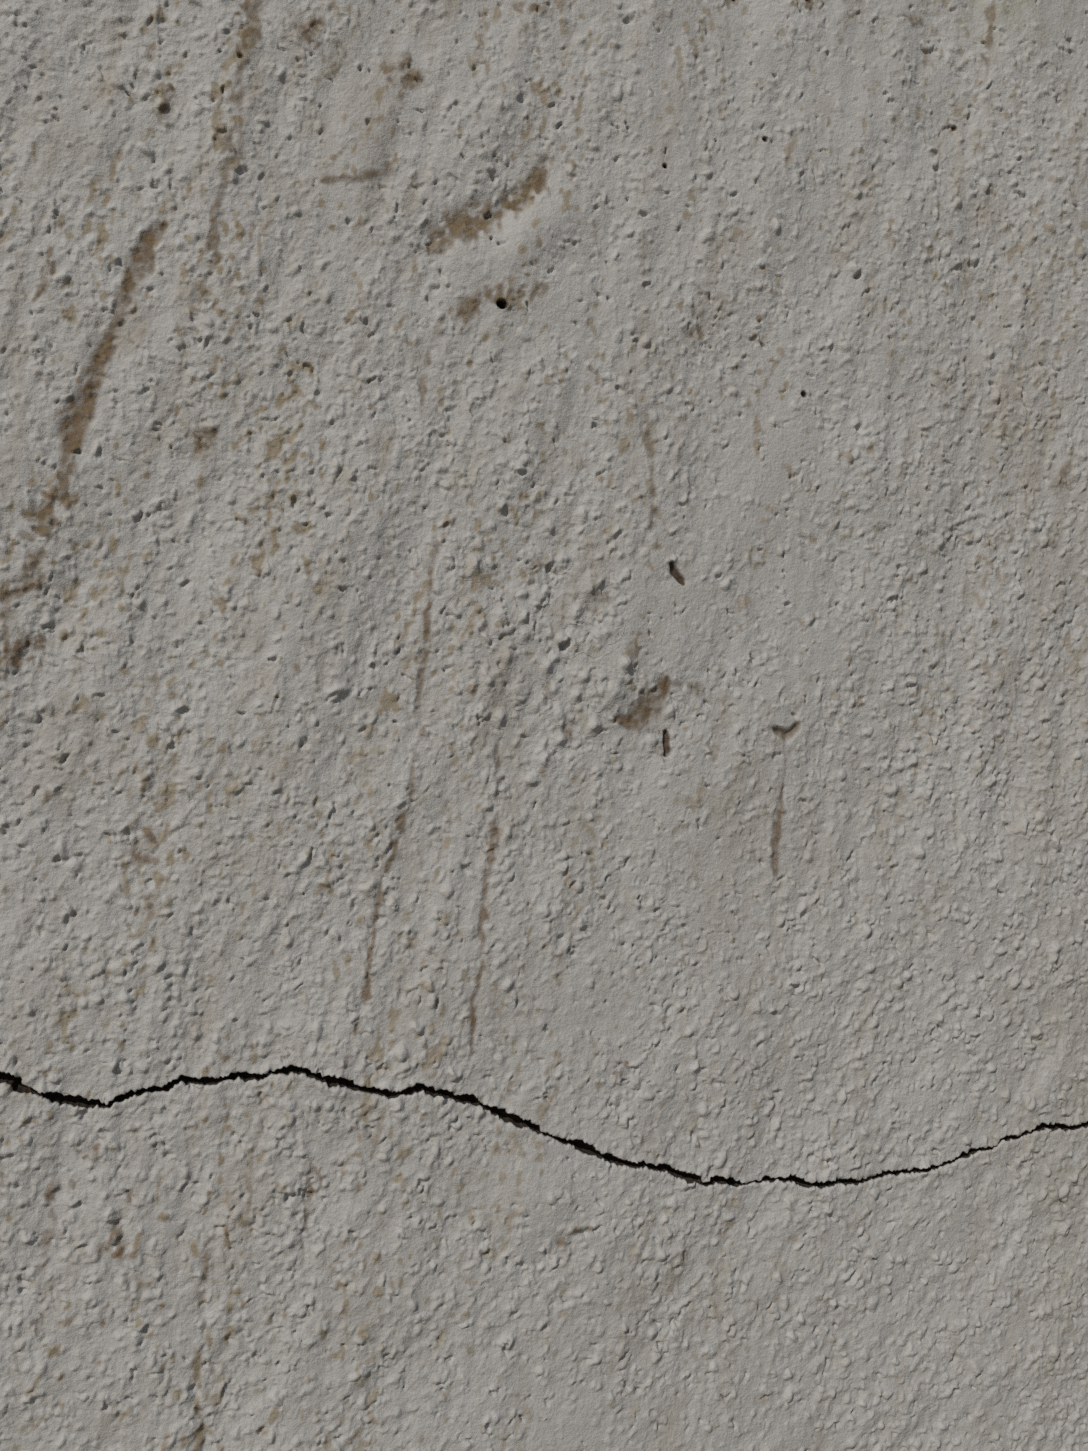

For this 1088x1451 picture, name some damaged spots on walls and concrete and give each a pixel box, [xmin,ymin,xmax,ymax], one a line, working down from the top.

crack [0,1056,1088,1198]